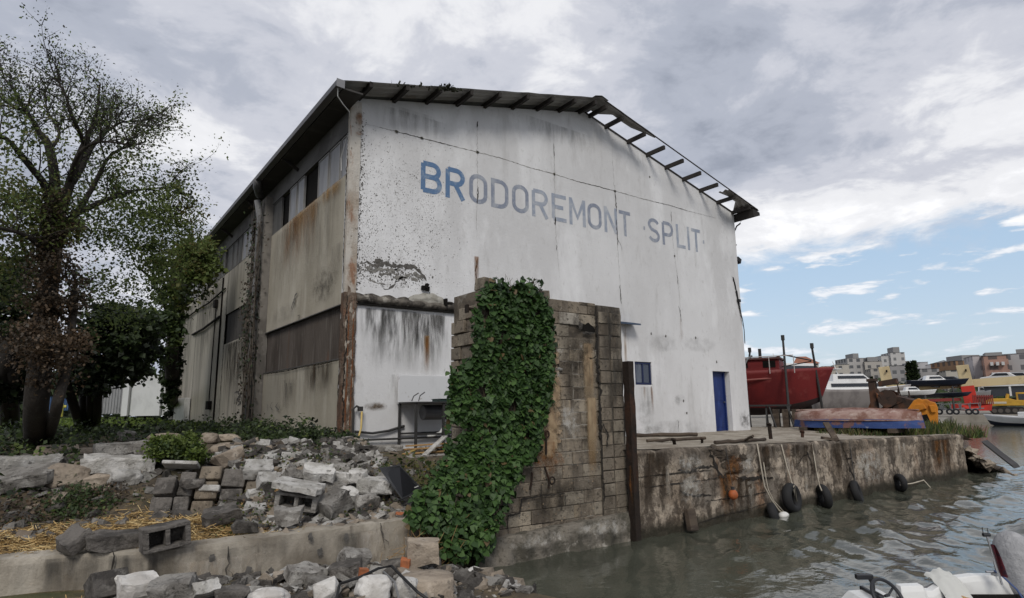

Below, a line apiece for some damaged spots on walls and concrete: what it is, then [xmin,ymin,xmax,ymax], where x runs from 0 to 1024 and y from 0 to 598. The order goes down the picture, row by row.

spalling [341,113,465,435]
damp [762,446,770,471]